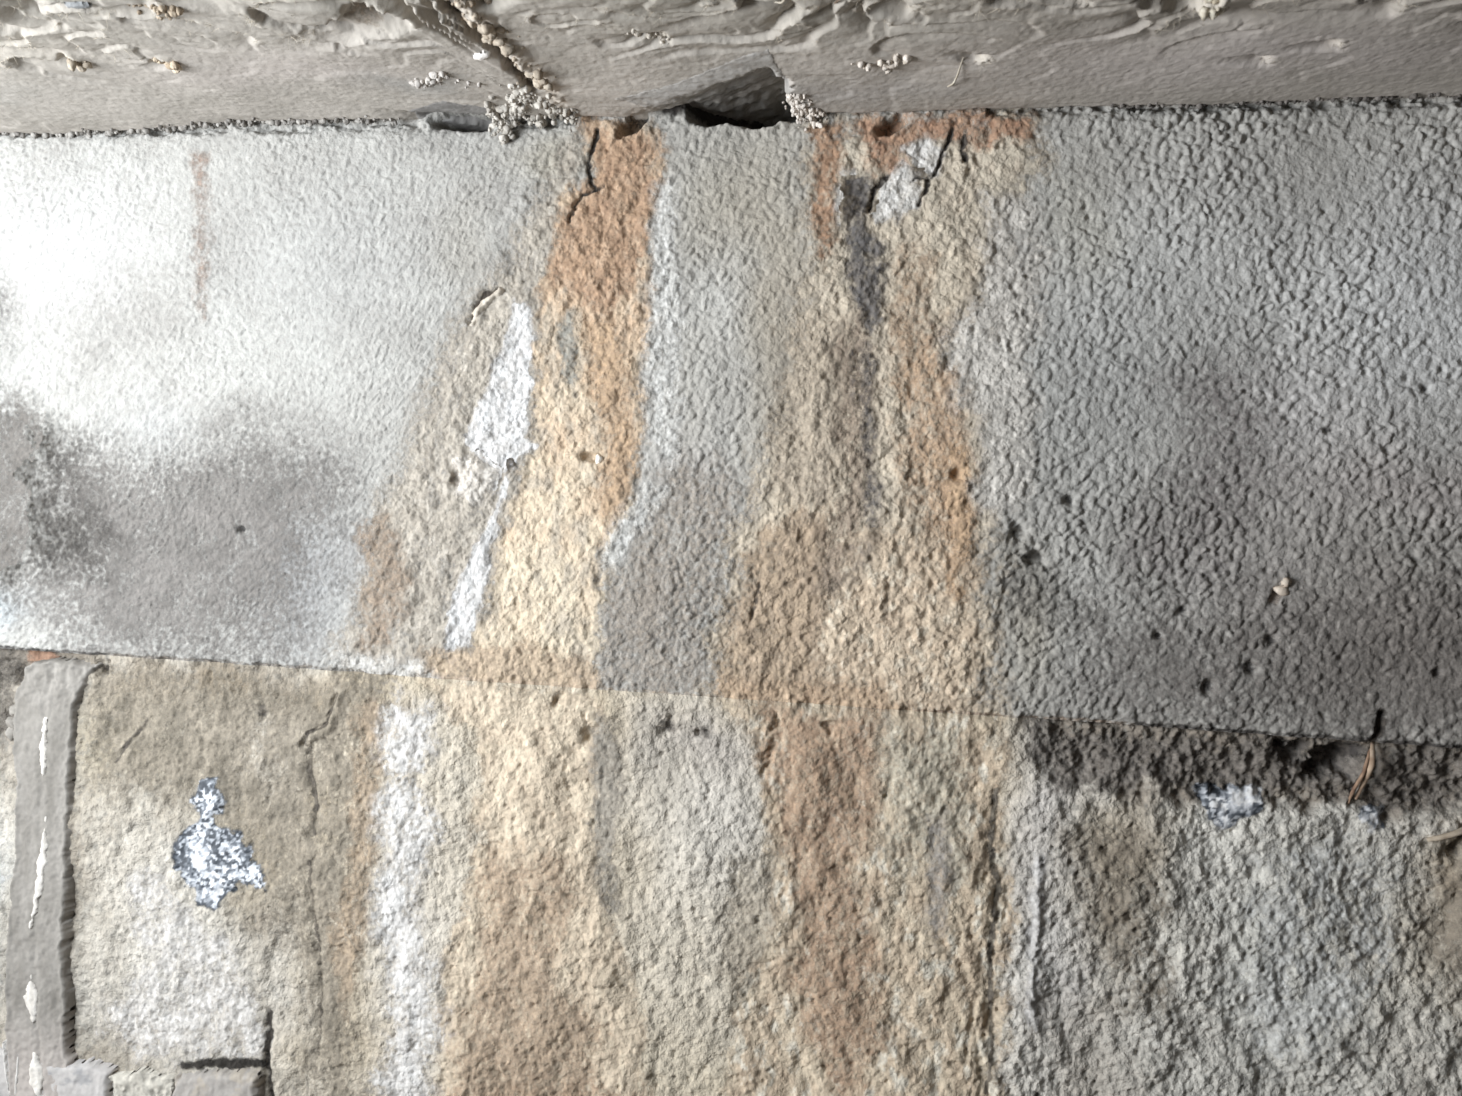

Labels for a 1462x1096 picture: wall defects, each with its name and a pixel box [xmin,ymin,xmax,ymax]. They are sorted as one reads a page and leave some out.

crack [570,128,605,222]
corrosion [329,109,1050,1096]